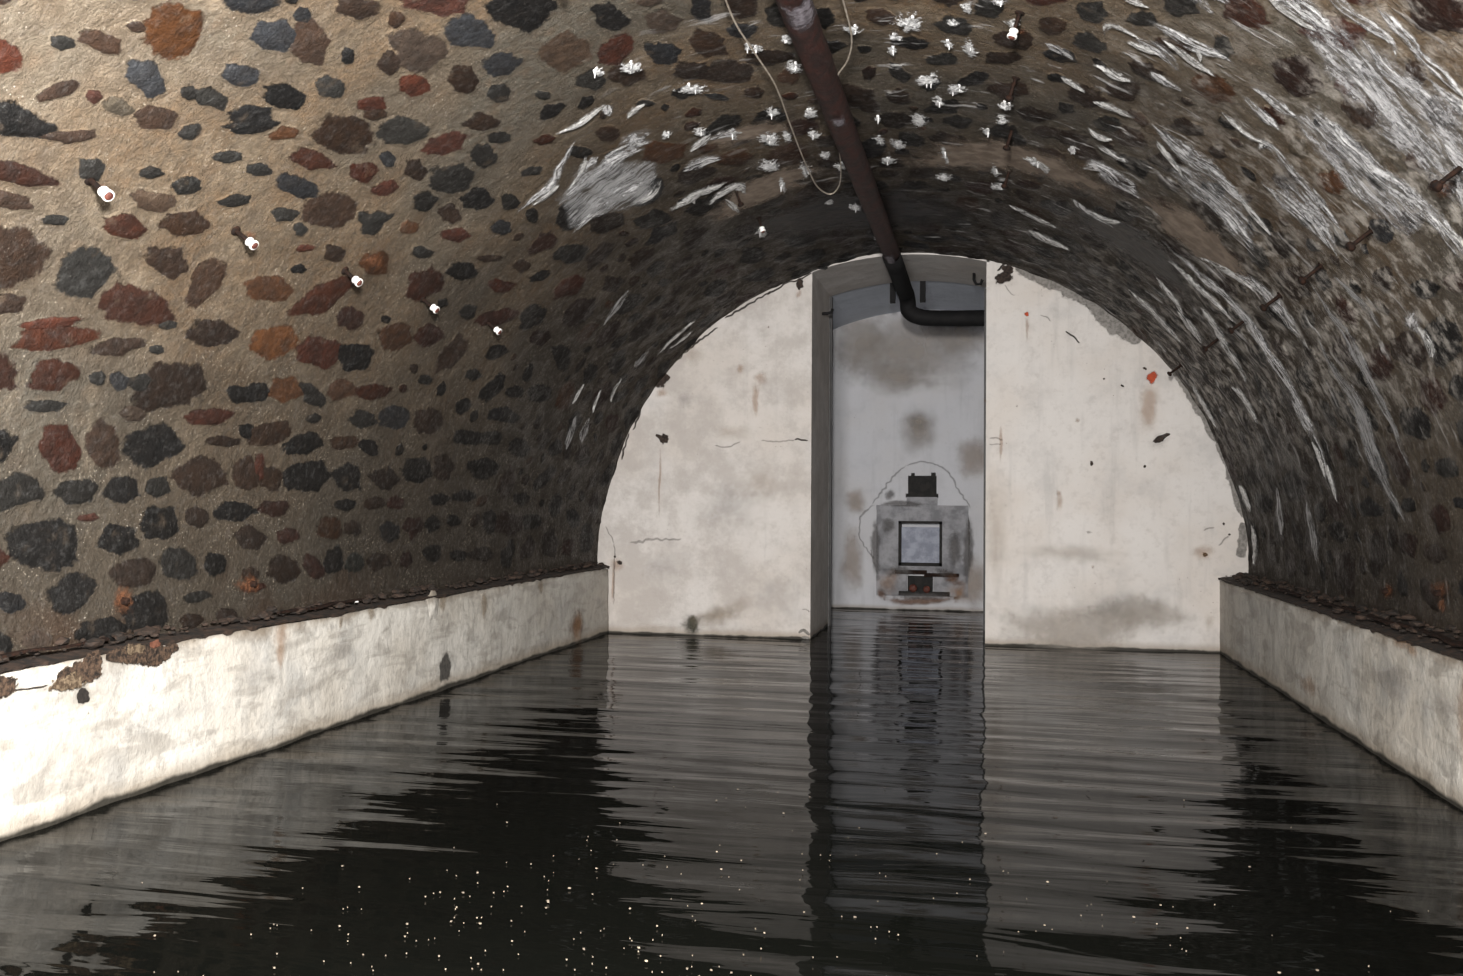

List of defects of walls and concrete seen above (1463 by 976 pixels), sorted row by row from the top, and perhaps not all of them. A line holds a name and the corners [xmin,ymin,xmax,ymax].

water stain [521,104,672,230]
water stain [593,60,642,78]
water stain [672,106,876,240]
water stain [888,11,923,56]
water stain [871,72,967,166]
water stain [1068,129,1139,198]
water stain [1103,24,1230,91]
water stain [1155,127,1270,247]
water stain [1222,88,1463,255]
water stain [1269,0,1463,207]
water stain [1073,200,1337,501]
flaking render [0,639,179,703]